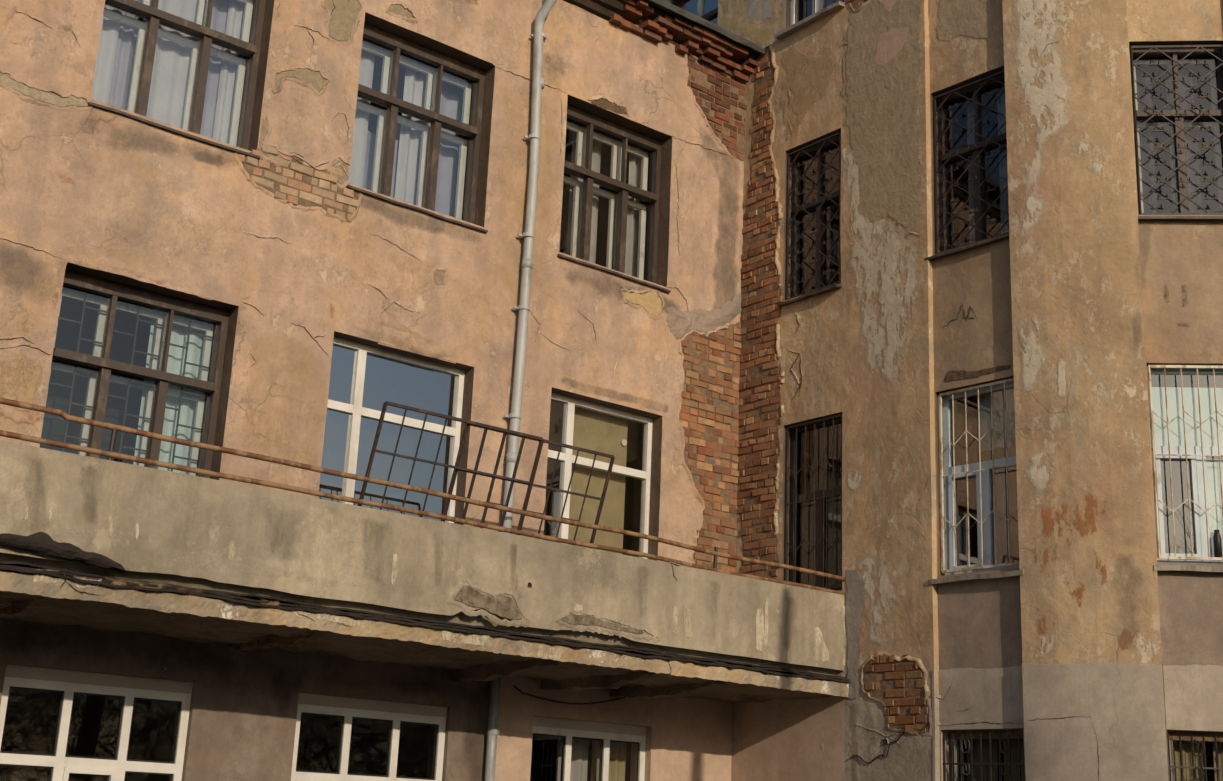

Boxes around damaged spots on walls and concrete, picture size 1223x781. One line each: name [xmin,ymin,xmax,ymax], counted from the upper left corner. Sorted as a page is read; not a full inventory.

peeling [321,0,365,46]
spalling [0,67,94,112]
peeling [1014,0,1070,235]
spalling [232,114,363,223]
spalling [608,0,785,579]
peeling [841,148,918,381]
peeling [293,610,360,626]
spalling [442,578,531,646]
peeling [537,646,563,659]
spalling [555,608,660,645]
spalling [858,556,933,737]
crack [853,683,1099,777]